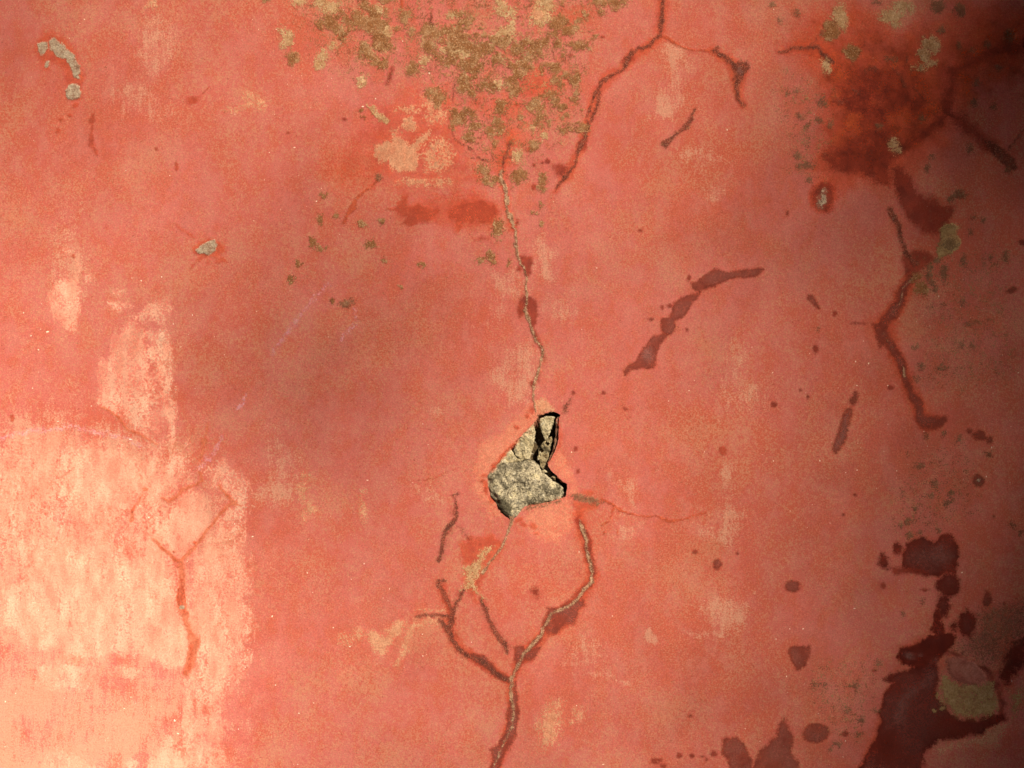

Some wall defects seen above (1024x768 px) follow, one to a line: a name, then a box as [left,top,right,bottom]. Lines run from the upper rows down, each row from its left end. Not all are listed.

spalling [37,38,81,132]
peeling [366,94,457,188]
crack [555,0,751,192]
water stain [774,70,834,183]
water stain [820,1,862,65]
water stain [888,137,902,156]
water stain [910,0,966,72]
spalling [196,239,217,256]
crack [459,140,545,412]
crack [872,208,947,430]
spalling [472,397,575,540]
crack [416,492,706,768]